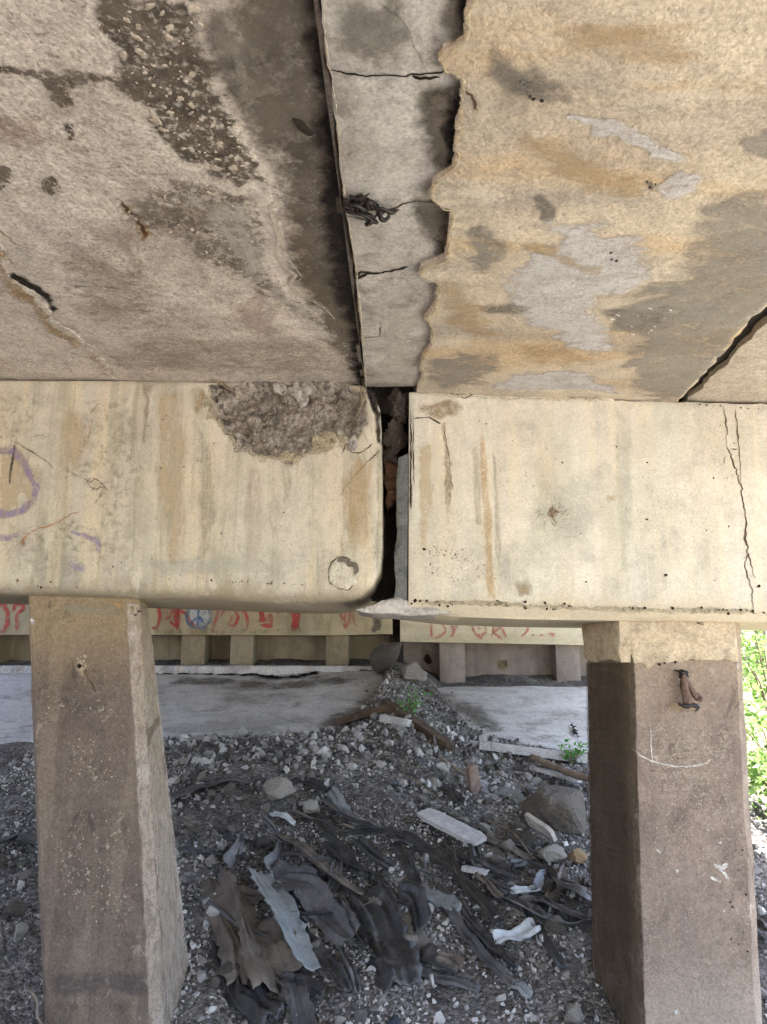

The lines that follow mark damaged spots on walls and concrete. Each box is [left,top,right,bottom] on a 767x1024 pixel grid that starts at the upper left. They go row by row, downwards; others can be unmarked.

water stain [443,0,467,42]
crack [328,69,444,80]
spalling [0,251,107,375]
peeling [0,0,325,334]
spalling [201,6,368,467]
water stain [217,0,365,386]
crack [354,266,407,280]
water stain [415,201,450,256]
water stain [420,85,462,168]
crack [679,307,767,403]
crack [723,407,754,610]
spalling [356,597,457,621]